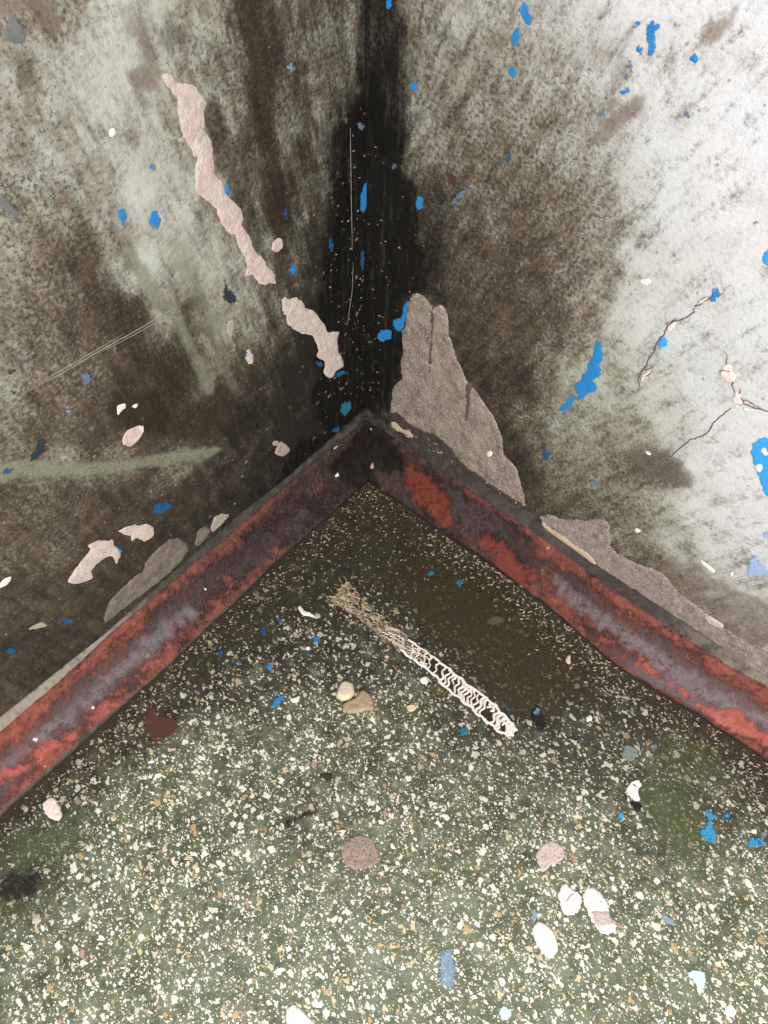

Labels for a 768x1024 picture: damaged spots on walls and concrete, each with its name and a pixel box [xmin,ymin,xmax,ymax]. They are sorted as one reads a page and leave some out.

flaking render [161,73,283,285]
water stain [208,0,285,252]
water stain [282,0,438,488]
flaking render [282,297,347,378]
flaking render [390,293,526,507]
water stain [633,451,689,485]
crack [638,285,731,390]
crack [642,352,768,461]
peeling [68,514,229,623]
corrosion [144,708,178,740]
peeling [540,514,768,677]
peeling [554,574,768,746]